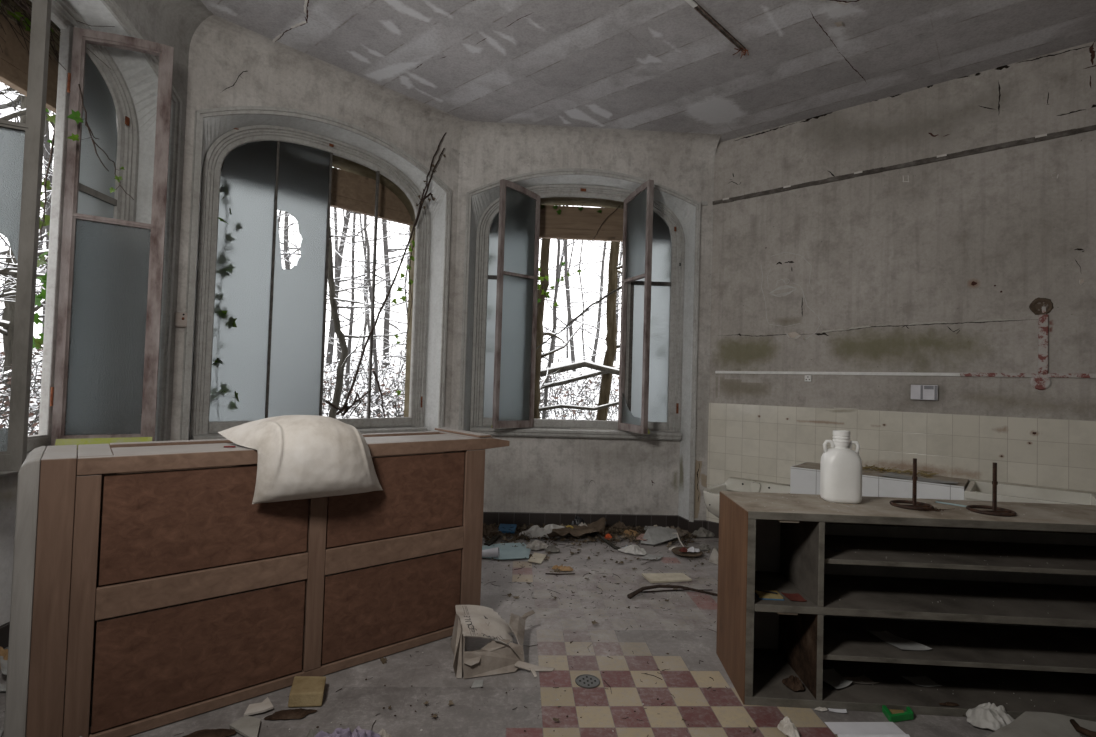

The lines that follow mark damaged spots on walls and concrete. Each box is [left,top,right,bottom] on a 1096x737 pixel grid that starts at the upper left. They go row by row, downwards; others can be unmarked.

crack [272,0,309,43]
crack [809,0,901,102]
crack [927,41,1096,116]
crack [735,112,832,141]
crack [816,317,1038,336]
water stain [820,316,1096,421]
water stain [483,314,804,520]